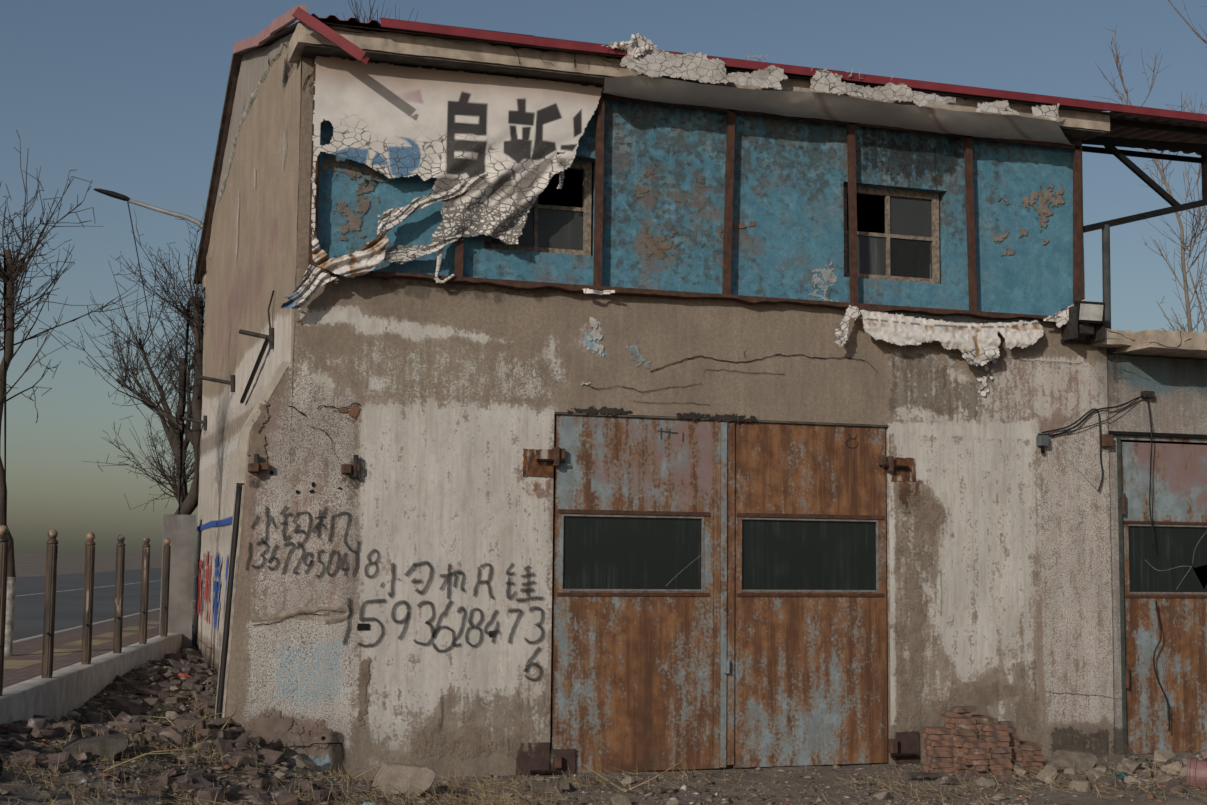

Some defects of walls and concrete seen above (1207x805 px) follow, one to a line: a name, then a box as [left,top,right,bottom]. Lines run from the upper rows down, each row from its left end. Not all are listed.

crack [246,39,314,93]
peeling [322,155,390,245]
peeling [992,184,1065,256]
crack [584,350,878,405]
damp [890,481,1038,733]
damp [411,688,556,760]
damp [1050,726,1133,758]